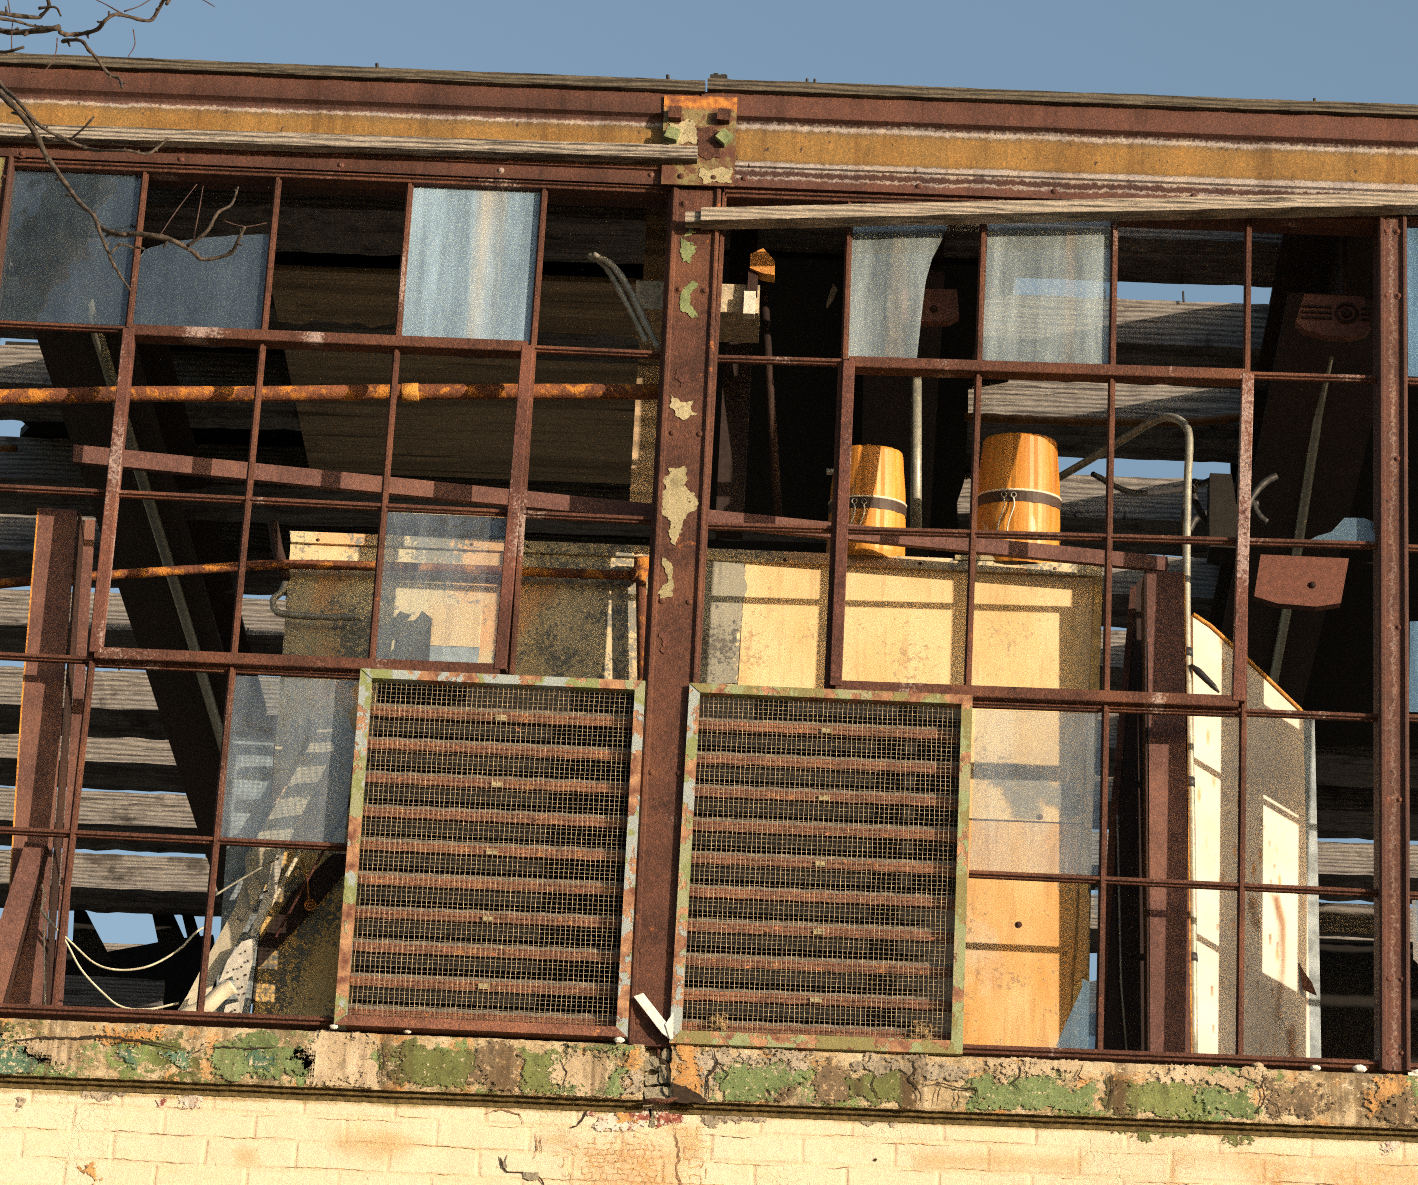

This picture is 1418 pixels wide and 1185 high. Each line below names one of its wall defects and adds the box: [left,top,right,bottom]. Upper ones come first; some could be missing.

peeling [664,119,734,184]
peeling [658,466,699,598]
spalling [0,1020,89,1075]
crack [1,1035,279,1053]
spalling [117,1030,479,1091]
crack [0,1055,768,1185]
peeling [517,1042,821,1132]
crack [706,1048,729,1099]
crack [806,1057,1041,1173]
peeling [845,1052,1268,1147]
crack [1077,1065,1114,1114]
crack [1222,1074,1418,1185]